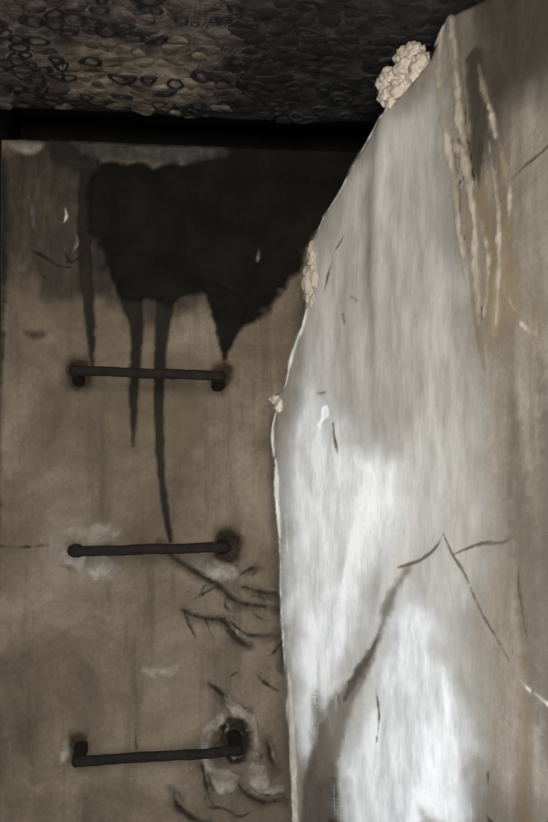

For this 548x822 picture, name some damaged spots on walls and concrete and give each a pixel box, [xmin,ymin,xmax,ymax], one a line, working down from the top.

leakage [448,16,464,143]
leakage [466,0,548,184]
leakage [492,170,501,325]
leakage [2,95,482,822]
spalling [268,394,288,551]
crack [211,669,235,704]
crack [175,738,277,820]
crack [180,562,286,688]
spalling [200,656,299,822]
crack [399,539,509,644]